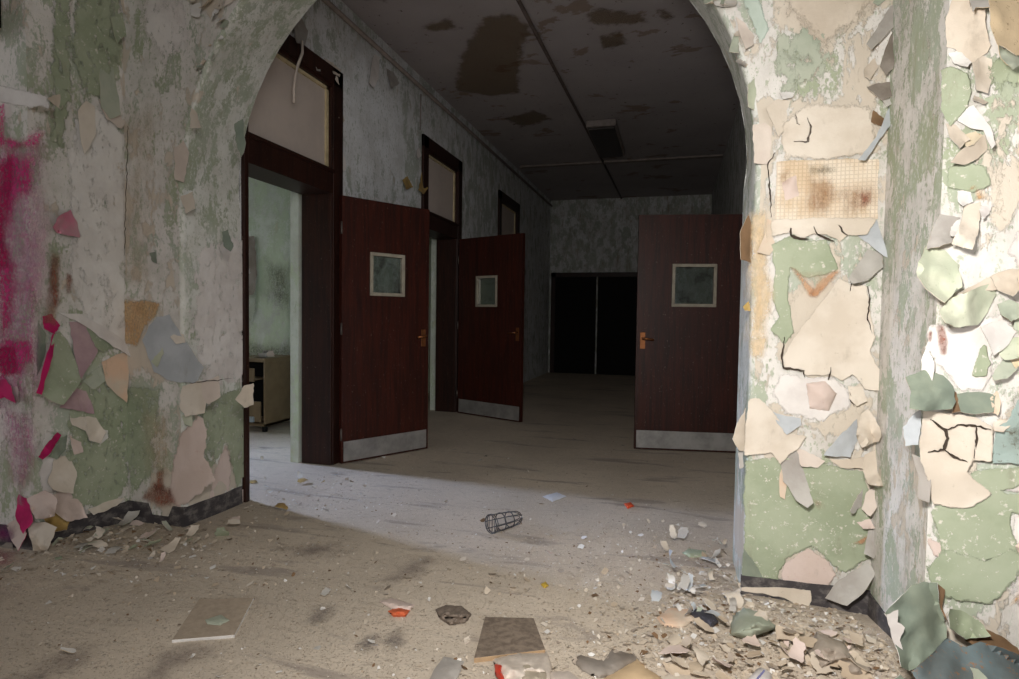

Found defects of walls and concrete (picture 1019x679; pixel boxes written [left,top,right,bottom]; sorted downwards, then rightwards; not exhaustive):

peeling [139,0,229,74]
peeling [234,119,246,157]
peeling [588,8,643,48]
peeling [703,0,894,164]
peeling [0,0,209,562]
peeling [142,230,256,525]
peeling [732,214,888,606]
crack [928,419,991,463]